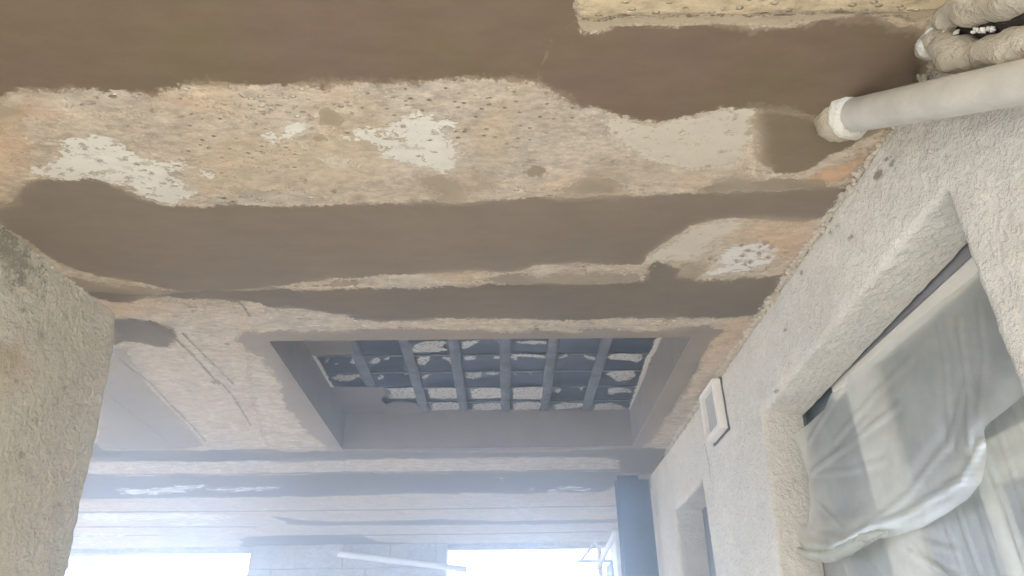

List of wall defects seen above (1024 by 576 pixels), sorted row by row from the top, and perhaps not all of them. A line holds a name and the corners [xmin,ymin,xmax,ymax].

spalling [0,89,166,123]
peeling [30,133,348,208]
spalling [176,83,462,176]
spalling [247,108,897,456]
crack [174,333,251,426]
spalling [88,358,616,495]